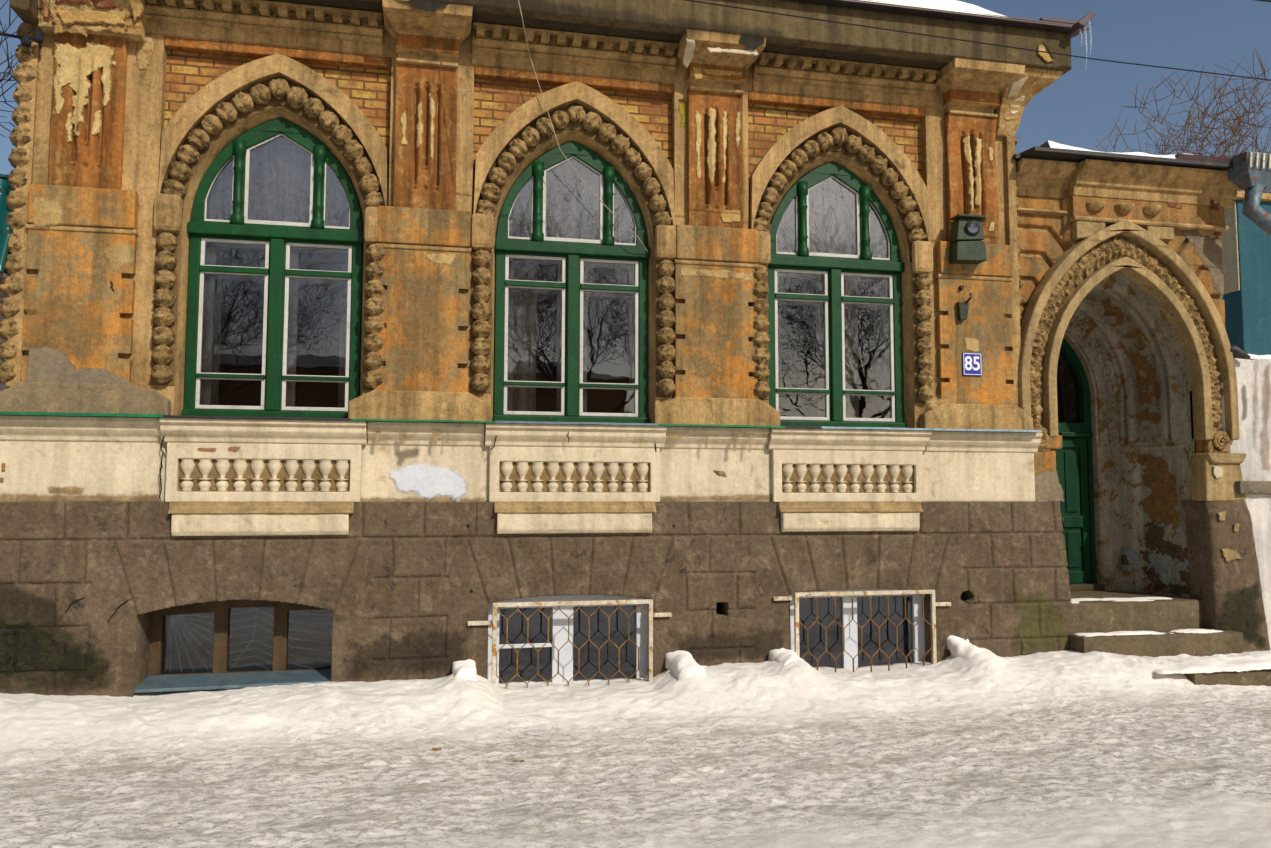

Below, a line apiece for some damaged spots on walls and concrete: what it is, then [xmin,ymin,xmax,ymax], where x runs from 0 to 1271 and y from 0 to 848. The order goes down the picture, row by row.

peeling [41,0,144,141]
peeling [401,94,436,159]
peeling [695,108,741,183]
peeling [963,136,993,211]
flaking render [1135,453,1190,596]